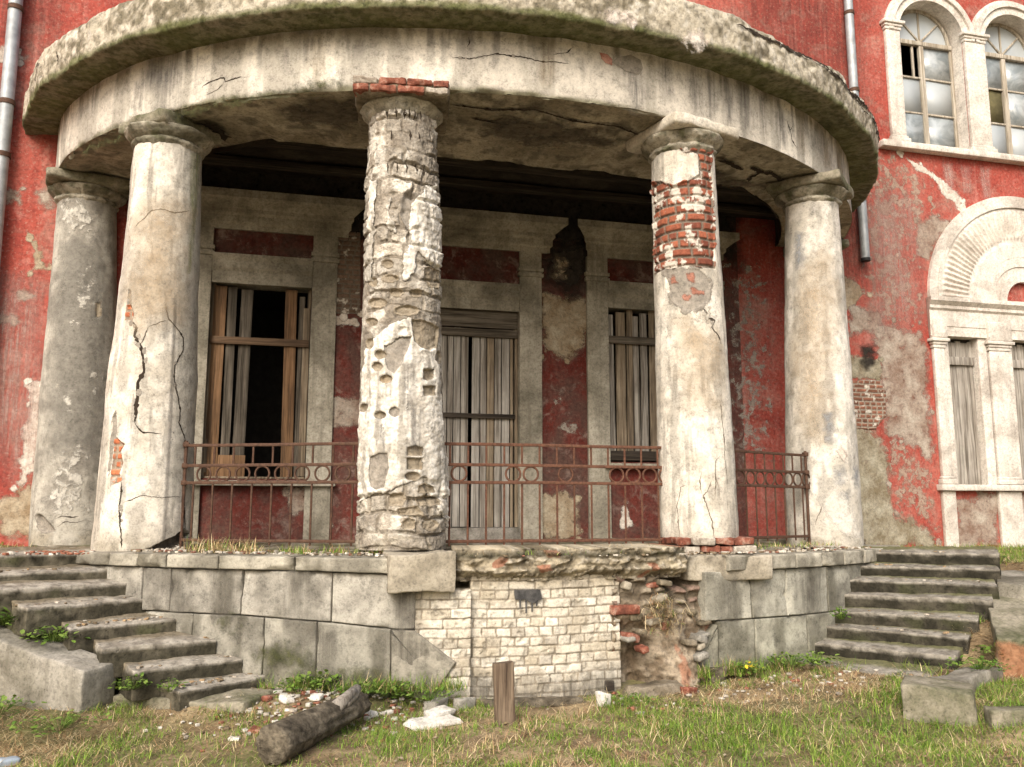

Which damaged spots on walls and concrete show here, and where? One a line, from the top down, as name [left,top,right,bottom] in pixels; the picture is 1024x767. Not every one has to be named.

crack [202,76,242,95]
crack [454,37,572,64]
crack [717,160,786,182]
crack [135,209,187,227]
crack [129,308,186,442]
peeling [333,180,450,532]
peeling [542,292,586,364]
flaking render [650,147,772,459]
peeling [823,151,966,547]
peeling [0,378,91,536]
flaking render [108,411,125,486]
crack [118,482,186,547]